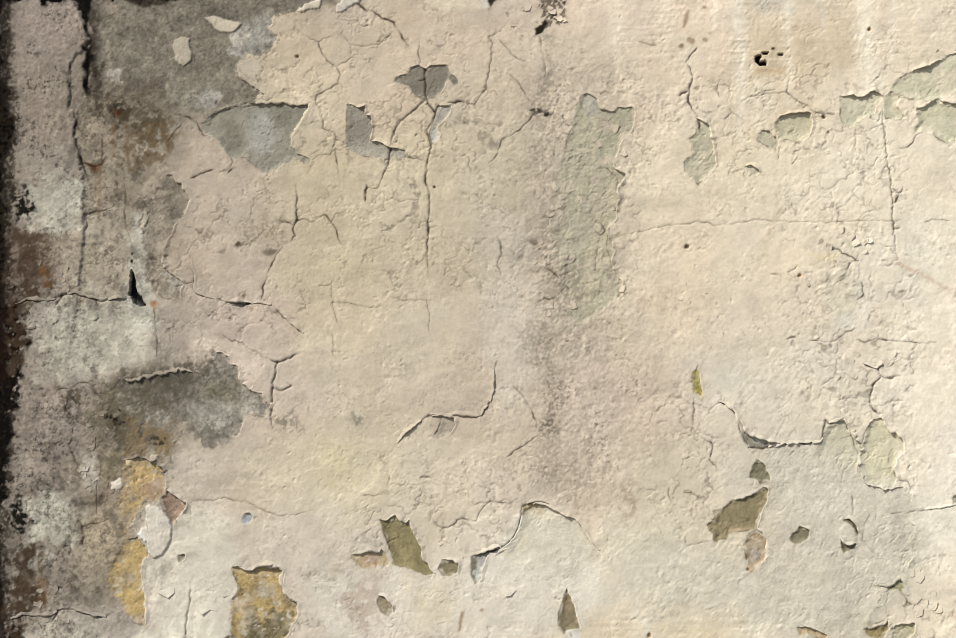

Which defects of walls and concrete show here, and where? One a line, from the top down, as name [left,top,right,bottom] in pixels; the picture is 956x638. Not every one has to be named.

damp [10,182,40,223]
crack [66,21,106,183]
damp [79,58,186,214]
spalling [83,0,312,174]
crack [153,3,547,431]
crack [543,107,950,301]
damp [3,493,36,537]
damp [58,342,435,570]
peeling [196,560,308,638]
peeling [347,498,603,636]
crack [691,247,956,558]
peeling [705,394,943,638]